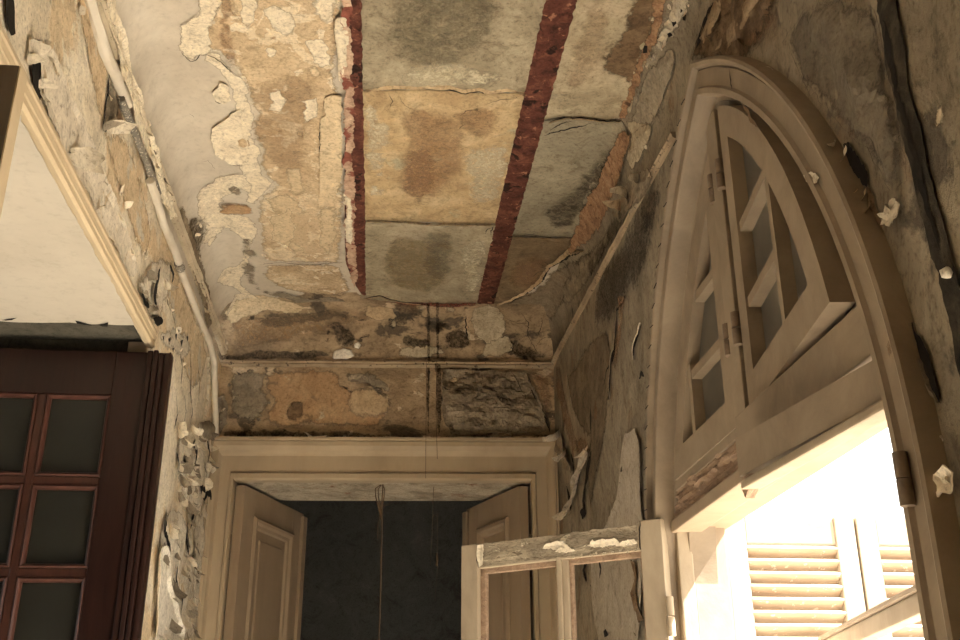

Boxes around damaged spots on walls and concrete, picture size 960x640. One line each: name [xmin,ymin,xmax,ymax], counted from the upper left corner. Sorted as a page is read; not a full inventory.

flaking render [6,0,16,36]
water stain [394,0,501,87]
crack [545,116,622,136]
flaking render [28,0,350,388]
water stain [548,160,607,226]
flaking render [471,0,692,357]
water stain [226,310,367,360]
water stain [389,305,469,348]
water stain [508,340,544,359]
crack [908,323,941,403]
peeling [153,421,219,640]
peeling [477,428,643,640]